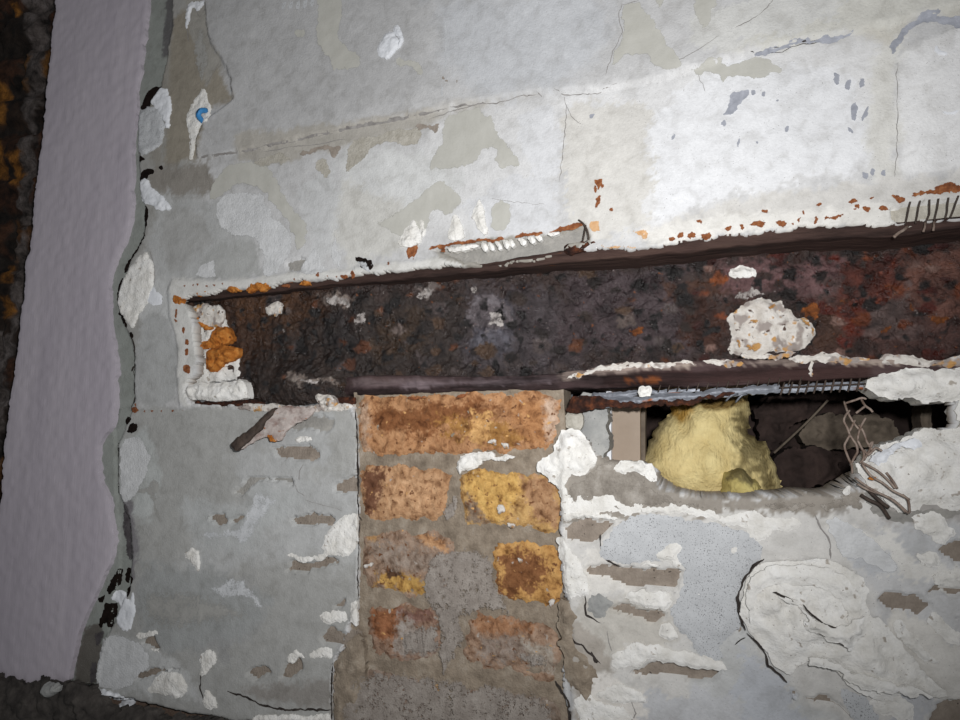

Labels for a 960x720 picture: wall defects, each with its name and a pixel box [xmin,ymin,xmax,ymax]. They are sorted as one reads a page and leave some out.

crack [197,0,638,182]
peeling [694,30,853,126]
rust [406,221,648,259]
rust [725,203,843,231]
rust [848,182,960,212]
rust [173,271,355,374]
rust [194,399,266,407]
spalling [747,390,913,488]
spalling [931,404,949,429]
peeling [111,590,136,631]
crack [735,559,787,683]
crack [773,592,844,646]